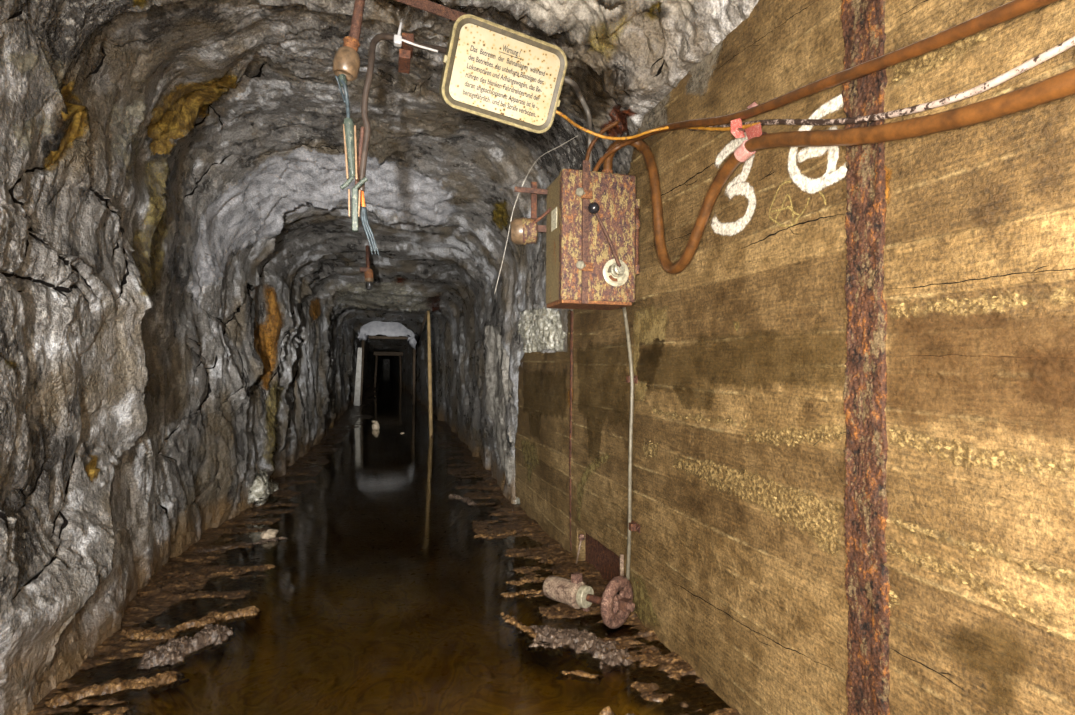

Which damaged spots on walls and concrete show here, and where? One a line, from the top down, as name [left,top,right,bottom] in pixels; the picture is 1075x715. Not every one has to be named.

crack [886,265,1075,290]
crack [671,582,841,674]